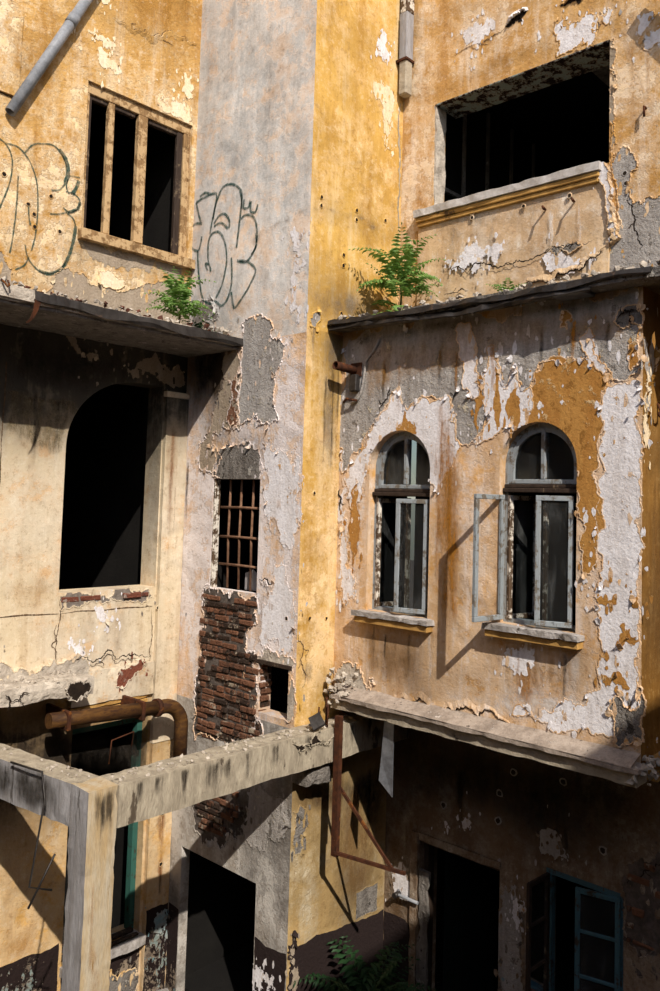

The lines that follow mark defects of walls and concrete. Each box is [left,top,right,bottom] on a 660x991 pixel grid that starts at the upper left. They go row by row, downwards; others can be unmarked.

peeling [553,0,660,63]
flaking render [593,34,660,272]
flaking render [42,241,220,327]
peeling [430,232,505,299]
crack [447,243,606,294]
peeling [193,313,308,742]
flaking render [332,287,660,749]
flaking render [59,585,156,633]
flaking render [0,637,102,702]
crack [51,625,150,666]
flaking render [192,783,311,861]
flaking render [252,930,301,991]